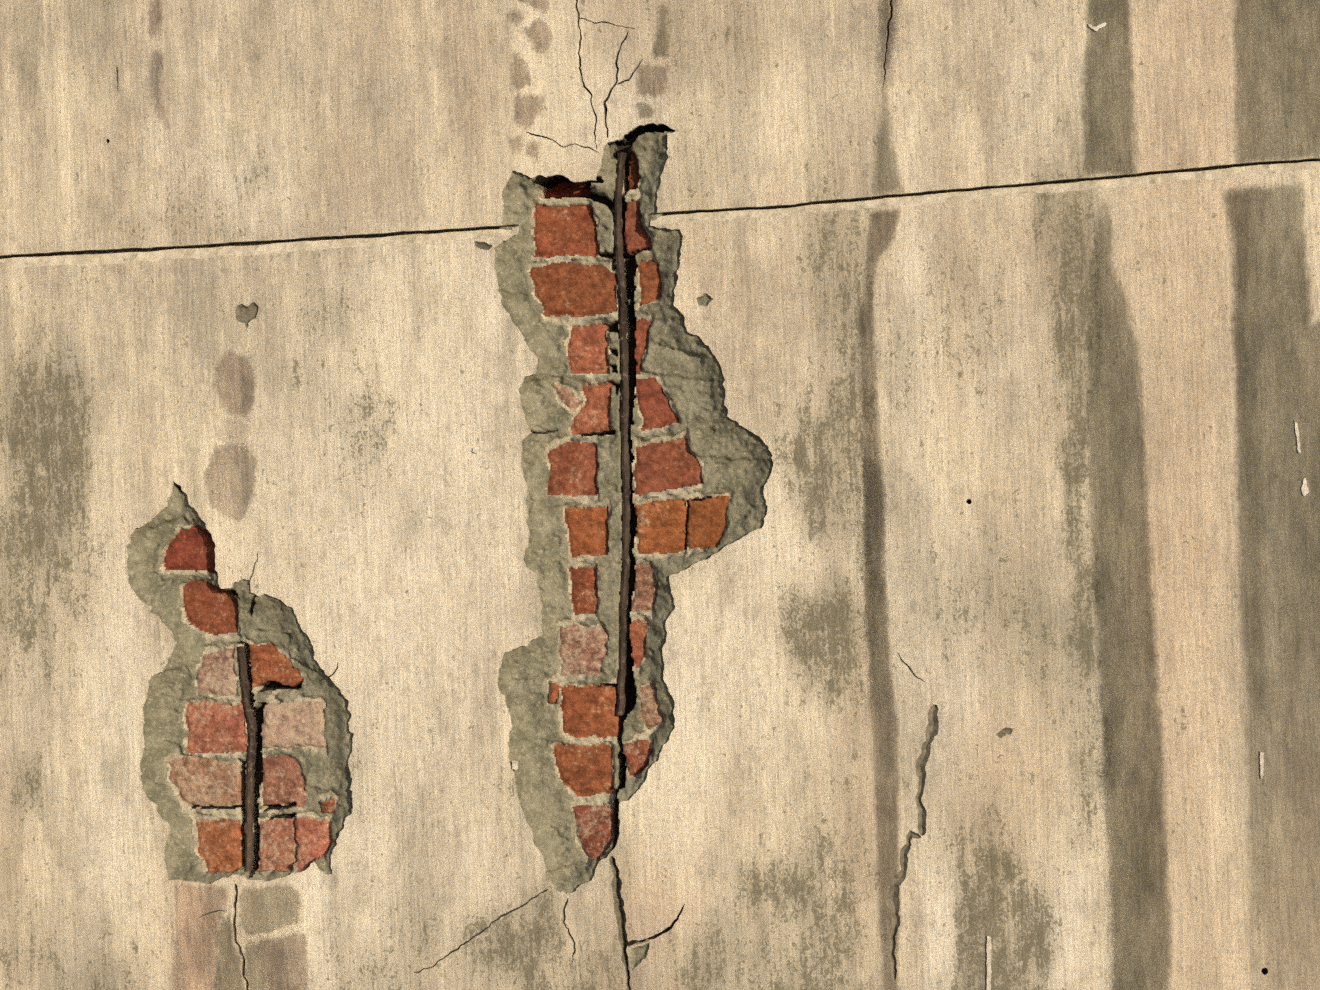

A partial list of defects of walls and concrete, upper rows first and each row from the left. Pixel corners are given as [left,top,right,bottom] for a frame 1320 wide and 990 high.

crack [526,0,643,153]
crack [883,0,893,86]
damp [1084,0,1135,175]
damp [1235,0,1320,162]
flaking render [473,124,773,893]
damp [1227,186,1320,665]
flaking render [127,482,354,883]
damp [1090,222,1170,990]
crack [886,653,939,980]
crack [199,884,249,990]
crack [414,889,576,973]
crack [609,856,685,990]